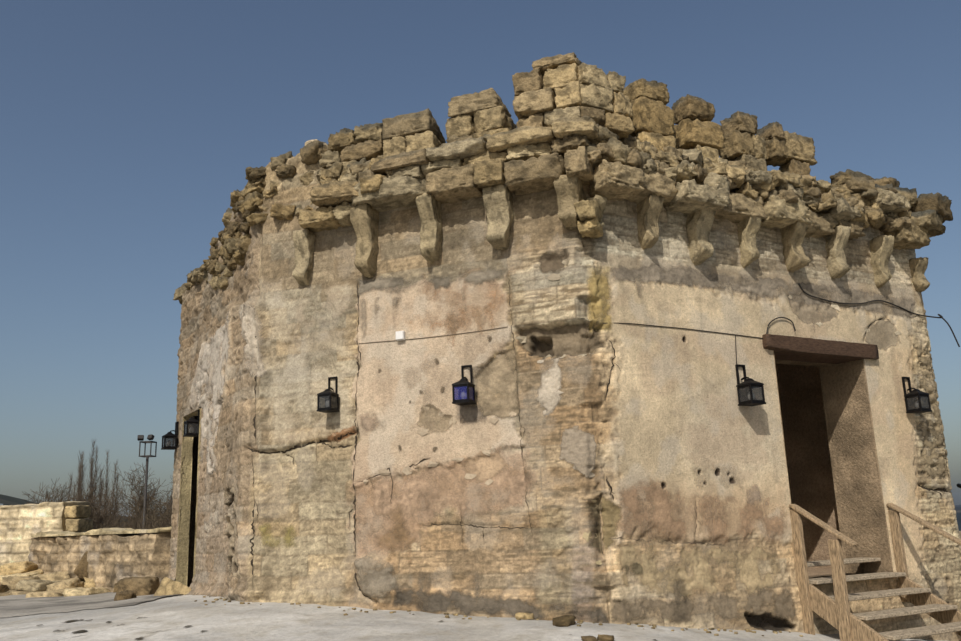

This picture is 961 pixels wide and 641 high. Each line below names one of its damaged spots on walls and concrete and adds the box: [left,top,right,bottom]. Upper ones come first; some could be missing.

spalling [534,250,570,281]
peeling [473,324,604,424]
crack [605,340,621,398]
crack [420,275,533,539]
crack [224,283,430,602]
damp [393,573,694,623]
spalling [671,613,803,637]
damp [709,577,796,620]